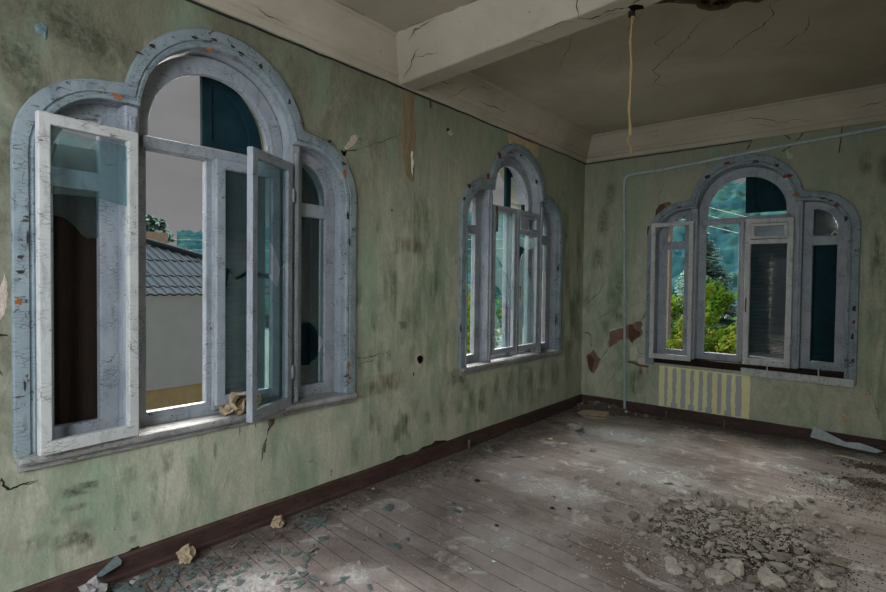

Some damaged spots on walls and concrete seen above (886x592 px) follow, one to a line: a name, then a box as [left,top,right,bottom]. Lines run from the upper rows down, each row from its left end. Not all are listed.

flaking render [654,0,763,11]
crack [403,0,477,78]
crack [520,0,639,70]
peeling [400,89,416,183]
peeling [0,275,22,320]
flaking render [586,350,601,373]
flaking render [609,321,645,365]
crack [0,478,37,490]